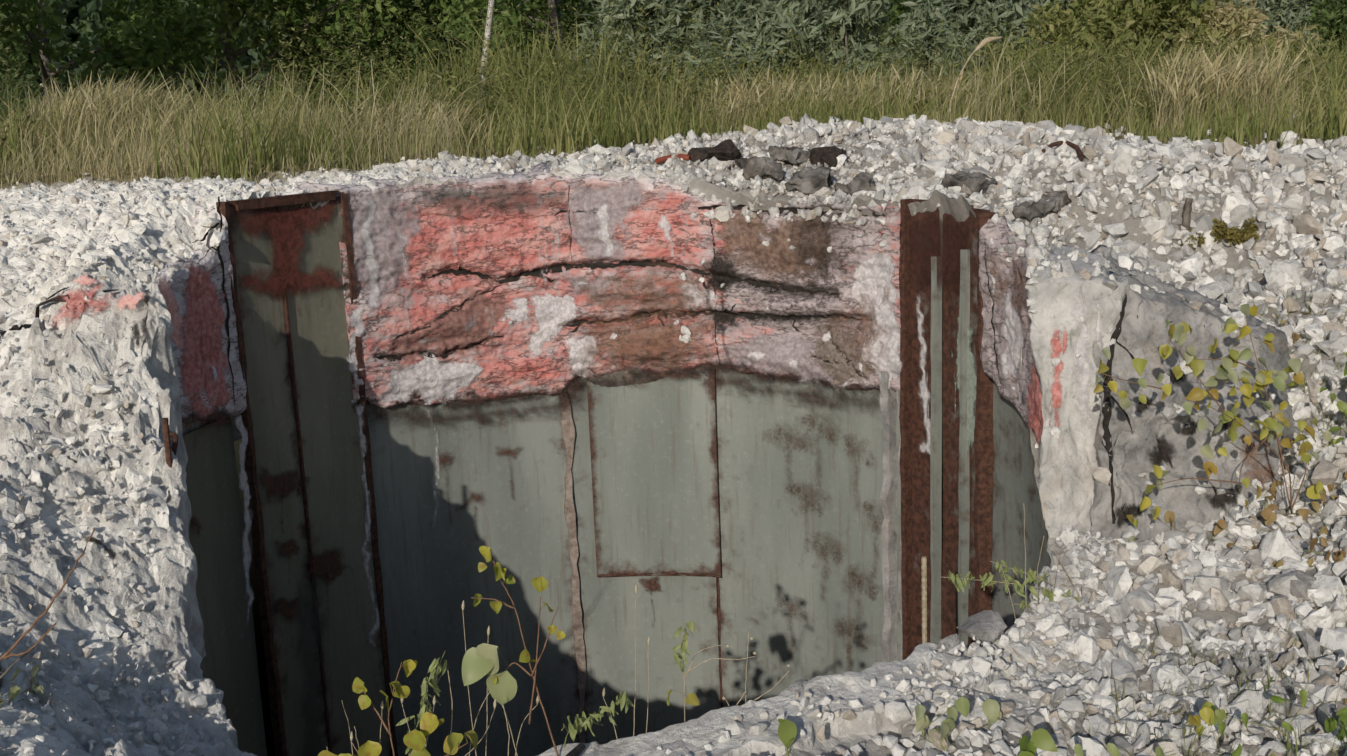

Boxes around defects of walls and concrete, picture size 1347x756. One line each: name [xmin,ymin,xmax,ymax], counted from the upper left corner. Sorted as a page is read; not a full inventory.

peeling [50,264,232,419]
rust [239,204,339,311]
peeling [346,190,617,405]
peeling [565,180,642,261]
crack [375,185,885,363]
peeling [674,283,720,325]
spalling [717,210,829,283]
peeling [724,253,902,388]
rust [909,216,967,287]
peeling [990,274,1067,444]
crack [1101,294,1135,524]